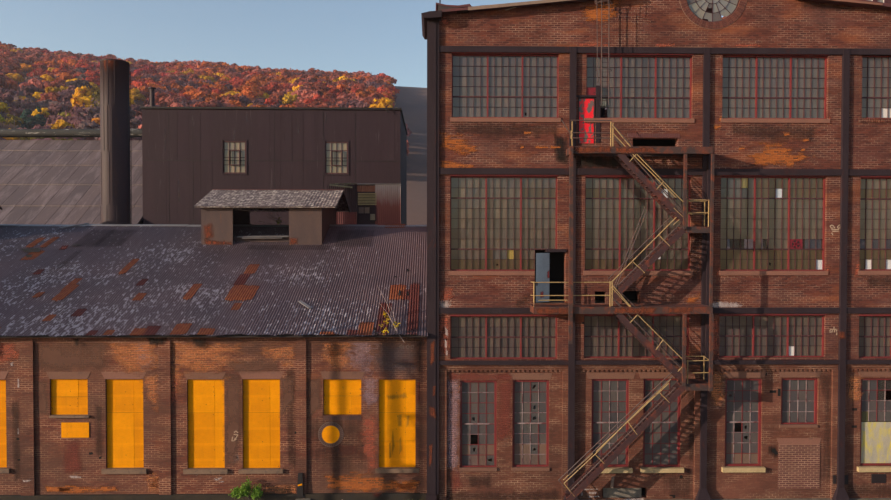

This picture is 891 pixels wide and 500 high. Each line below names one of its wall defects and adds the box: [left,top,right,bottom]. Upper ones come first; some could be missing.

spalling [583,0,622,21]
spalling [439,133,478,168]
spalling [738,133,808,167]
corrosion [33,278,83,301]
corrosion [225,264,260,310]
corrosion [347,284,410,335]
spalling [324,415,420,493]